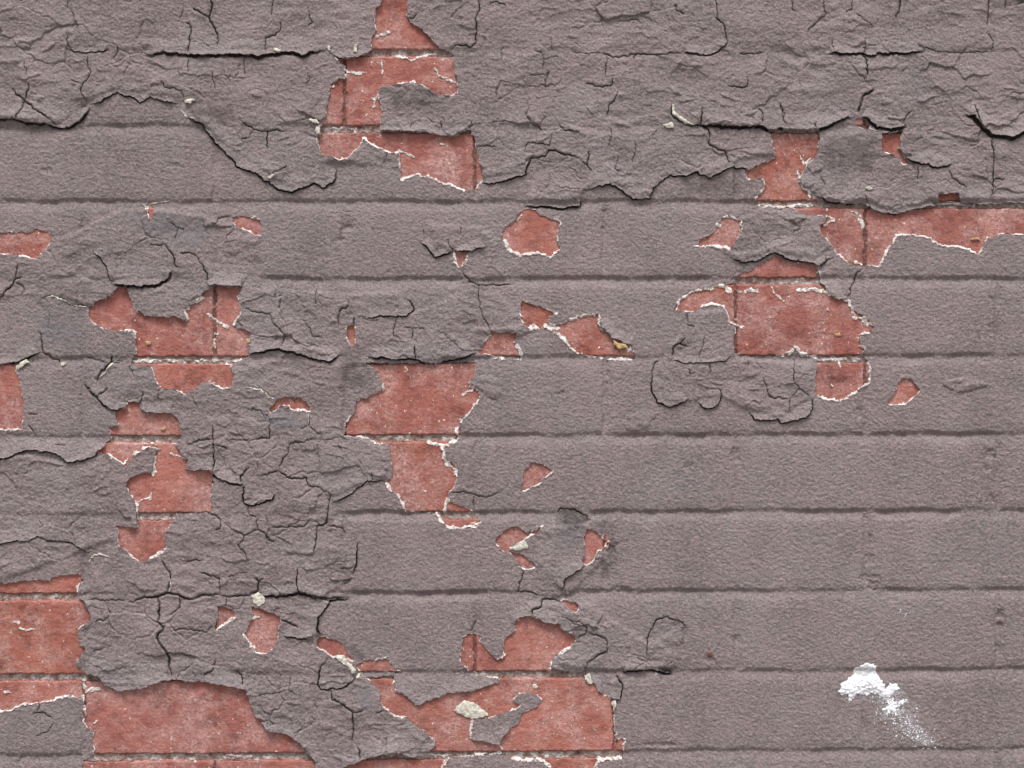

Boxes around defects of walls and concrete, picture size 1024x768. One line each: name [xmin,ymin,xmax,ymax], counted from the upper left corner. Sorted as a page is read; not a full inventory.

crack [161,0,219,92]
peeling [0,0,529,193]
crack [527,117,590,167]
crack [537,44,672,109]
crack [616,105,787,172]
crack [792,0,874,111]
peeling [0,229,52,260]
peeling [501,103,1024,424]
peeling [0,244,636,562]
crack [88,399,351,675]
peeling [0,521,322,768]
peeling [242,508,687,768]